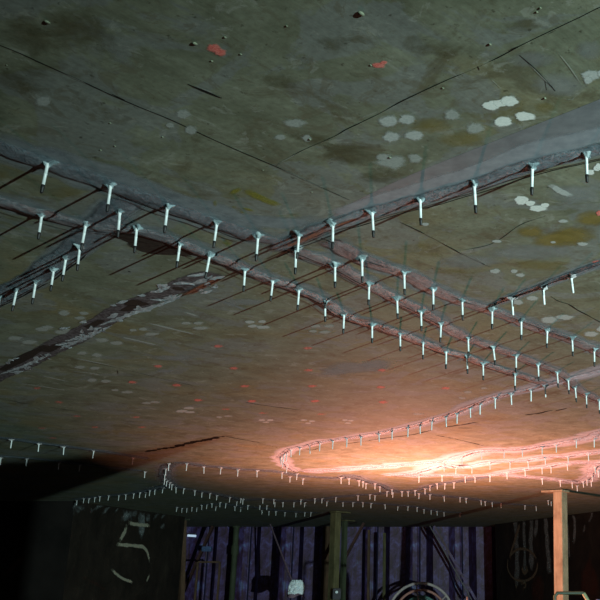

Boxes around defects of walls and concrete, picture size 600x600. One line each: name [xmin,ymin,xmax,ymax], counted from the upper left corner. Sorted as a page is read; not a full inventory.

crack [0,7,600,200]
peeling [0,272,226,382]
crack [0,138,600,514]
leakage [520,212,600,247]